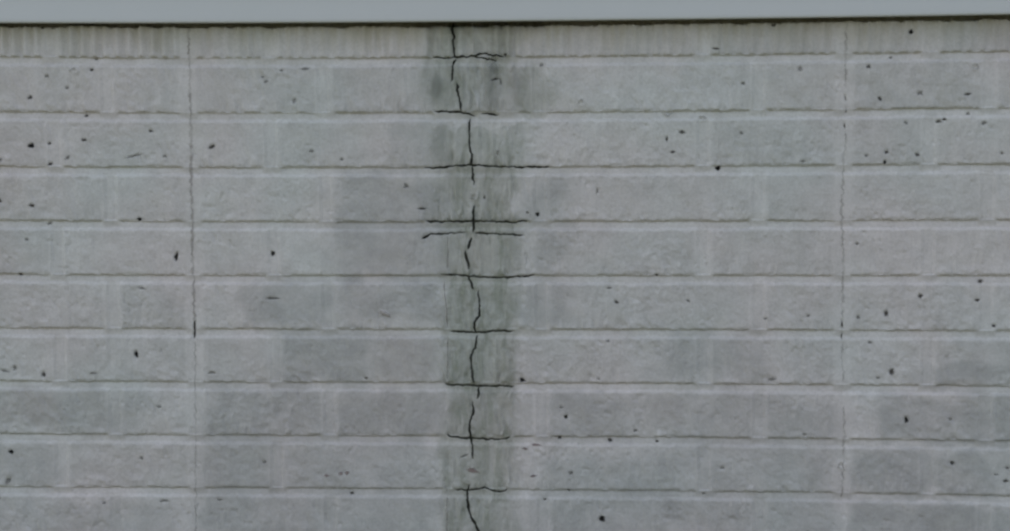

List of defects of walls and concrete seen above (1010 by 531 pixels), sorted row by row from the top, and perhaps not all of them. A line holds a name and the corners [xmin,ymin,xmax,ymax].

crack [424,24,549,458]
crack [446,485,507,531]